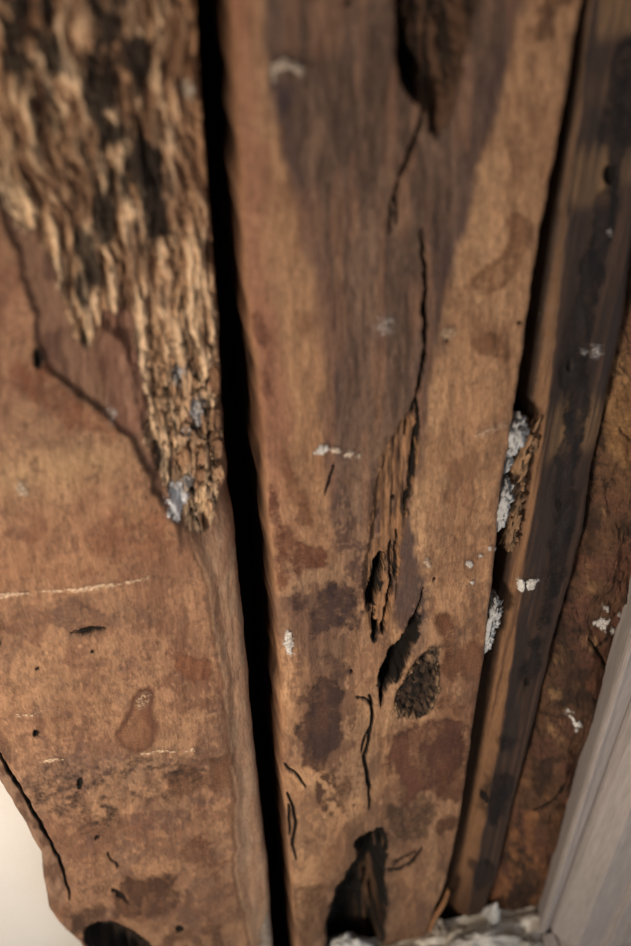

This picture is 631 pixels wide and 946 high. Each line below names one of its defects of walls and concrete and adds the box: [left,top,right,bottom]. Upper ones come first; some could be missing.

crack [389,117,421,230]
crack [403,240,427,515]
water stain [294,568,368,639]
water stain [294,655,354,815]
crack [357,695,373,808]
water stain [385,699,473,841]